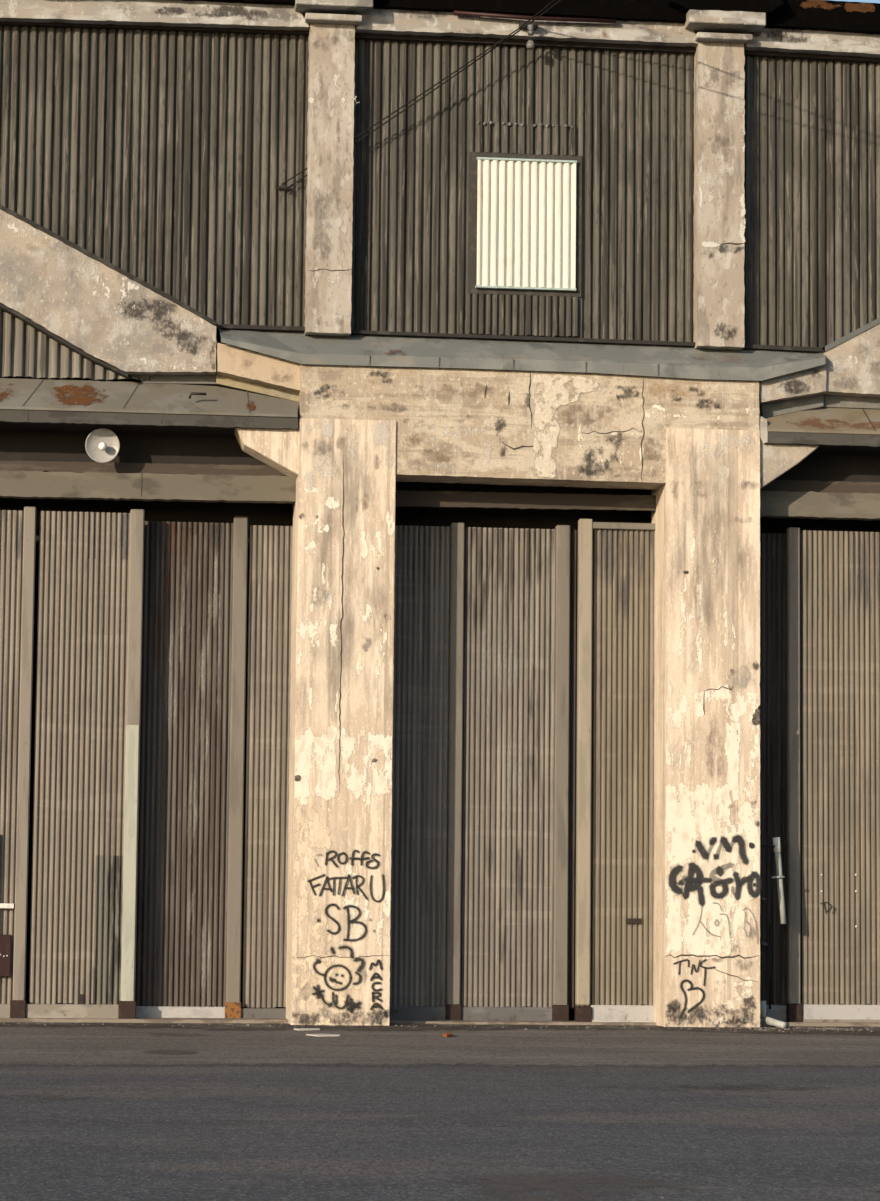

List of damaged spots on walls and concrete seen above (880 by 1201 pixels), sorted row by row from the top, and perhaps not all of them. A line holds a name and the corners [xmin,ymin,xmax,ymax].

corrosion [54,385,107,406]
crack [484,374,533,453]
crack [586,377,644,481]
peeling [296,487,340,669]
peeling [359,510,395,570]
peeling [665,530,760,960]
peeling [292,691,392,1026]